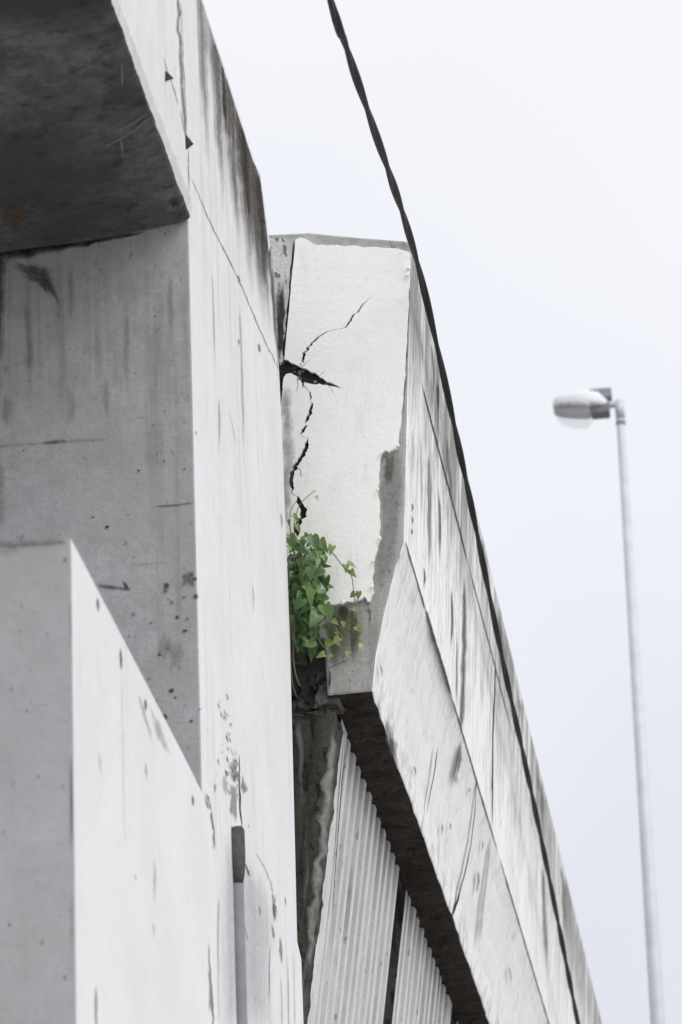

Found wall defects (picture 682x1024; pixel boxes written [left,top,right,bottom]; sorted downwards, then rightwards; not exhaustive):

damp [200,2,278,350]
flaking render [340,452,399,605]
damp [294,721,335,958]